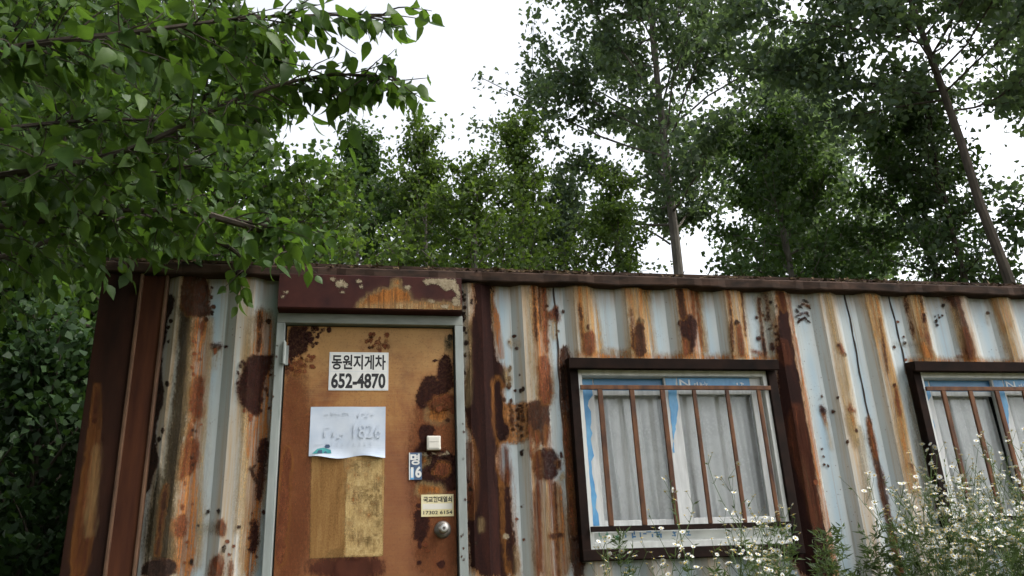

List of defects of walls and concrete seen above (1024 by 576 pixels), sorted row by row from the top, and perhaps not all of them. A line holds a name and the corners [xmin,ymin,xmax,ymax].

rust [172,309,385,576]
peeling [422,278,461,309]
rust [357,280,904,576]
rust [865,293,1023,515]